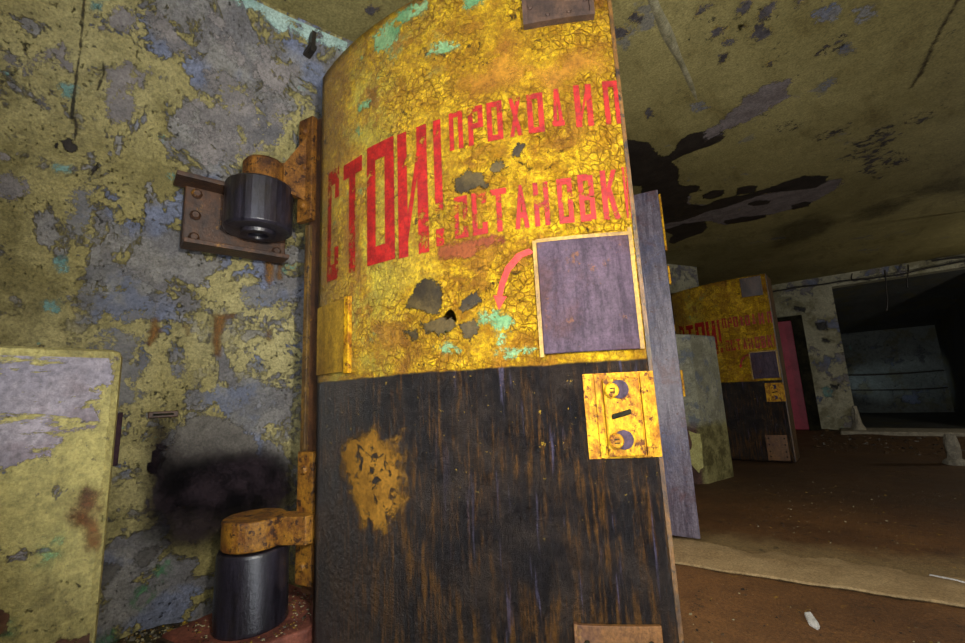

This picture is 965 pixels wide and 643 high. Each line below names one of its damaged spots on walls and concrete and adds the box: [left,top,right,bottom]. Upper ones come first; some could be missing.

peeling [235,0,347,53]
peeling [372,0,429,54]
spalling [710,0,778,65]
peeling [91,0,303,168]
spalling [703,78,792,140]
spalling [55,137,79,153]
spalling [662,178,844,230]
peeling [402,277,537,360]
peeling [0,259,157,471]
flaking render [162,356,281,476]
corrosion [340,429,409,535]
flaking render [101,560,122,590]